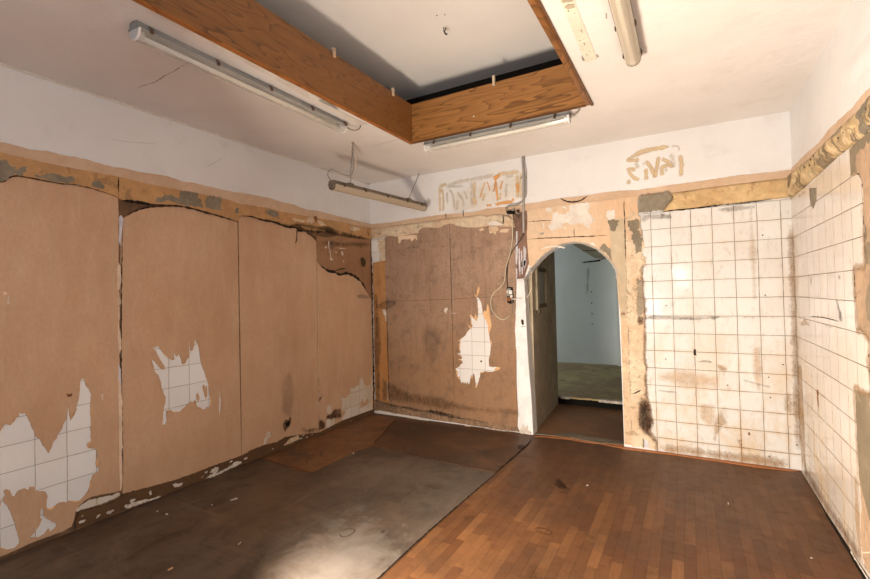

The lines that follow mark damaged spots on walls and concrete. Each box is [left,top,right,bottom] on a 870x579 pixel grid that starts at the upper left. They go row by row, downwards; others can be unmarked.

spalling [849,142,870,243]
peeling [292,217,385,299]
peeling [456,286,500,388]
spalling [855,254,870,342]
peeling [151,340,221,425]
peeling [325,377,429,429]
water stain [639,400,651,436]
peeling [0,376,161,550]
peeling [201,457,247,479]
spalling [859,478,870,573]